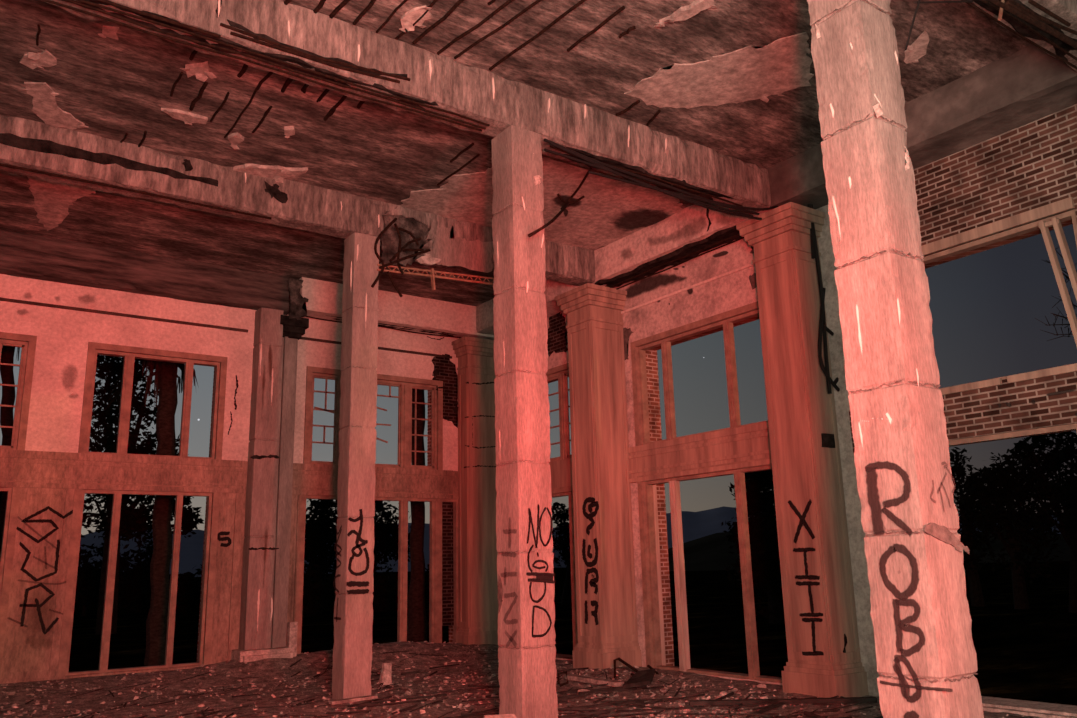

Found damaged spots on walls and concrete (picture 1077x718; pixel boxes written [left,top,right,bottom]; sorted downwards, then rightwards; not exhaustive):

peeling [20,24,57,69]
peeling [21,82,88,130]
spalling [42,0,490,149]
spalling [437,0,542,59]
spalling [489,0,586,71]
peeling [616,24,821,126]
spalling [0,133,218,187]
peeling [0,163,271,231]
peeling [233,163,308,193]
peeling [371,143,494,297]
peeling [534,145,742,250]
spalling [432,354,459,428]